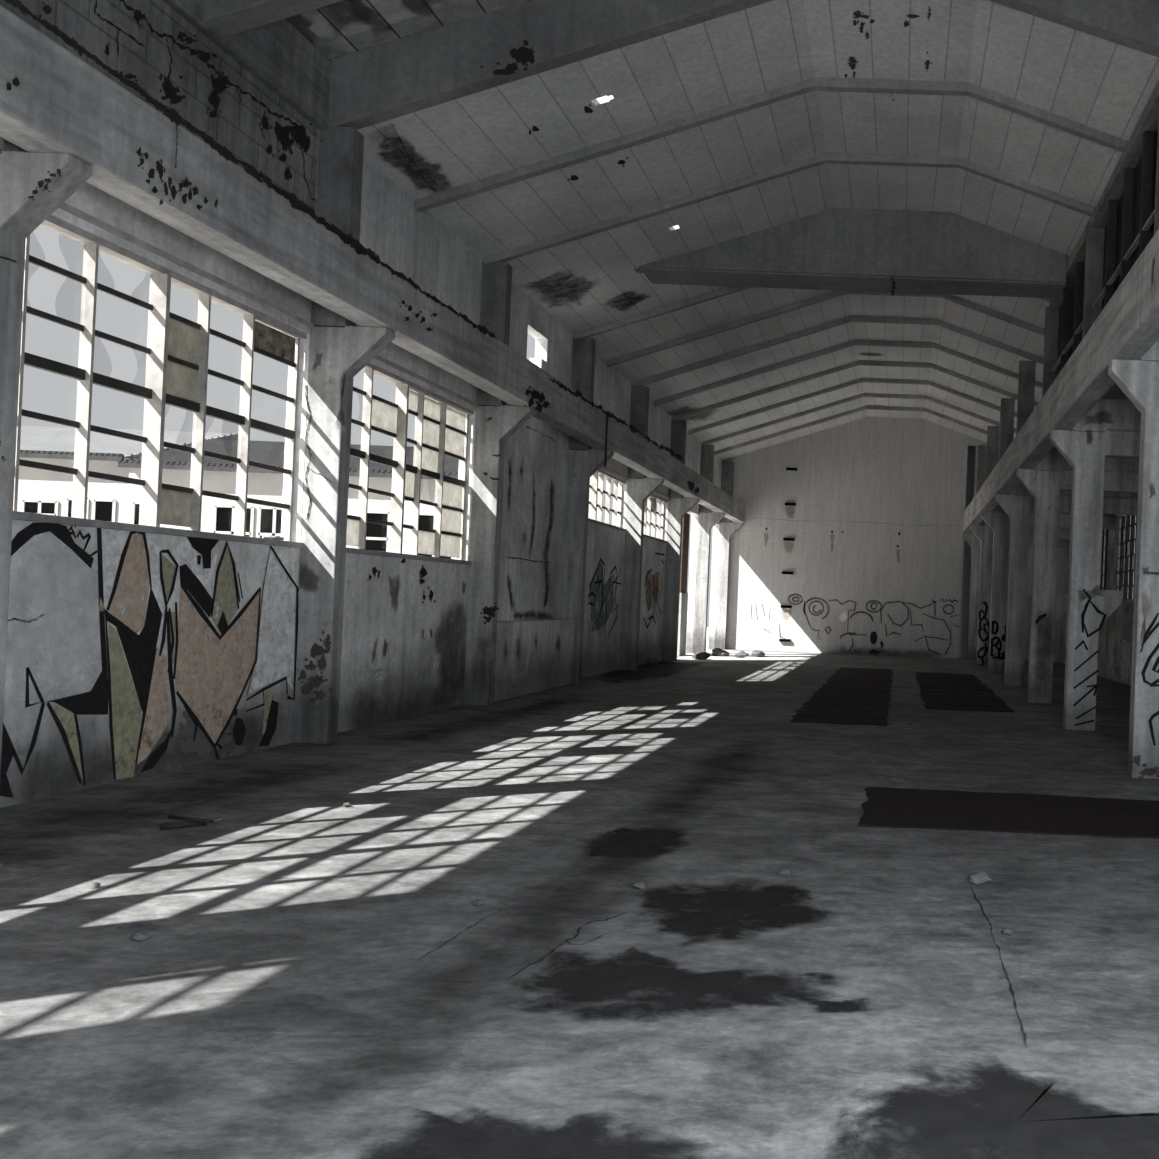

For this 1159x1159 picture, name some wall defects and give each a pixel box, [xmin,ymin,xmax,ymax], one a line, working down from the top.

damp [285,14,315,42]
damp [321,0,391,30]
peeling [853,10,875,39]
spalling [480,40,535,75]
peeling [844,56,858,78]
spalling [5,0,497,340]
damp [379,137,450,192]
damp [528,273,591,307]
damp [612,292,649,310]
flaking render [297,630,333,703]
crack [971,885,1027,1045]